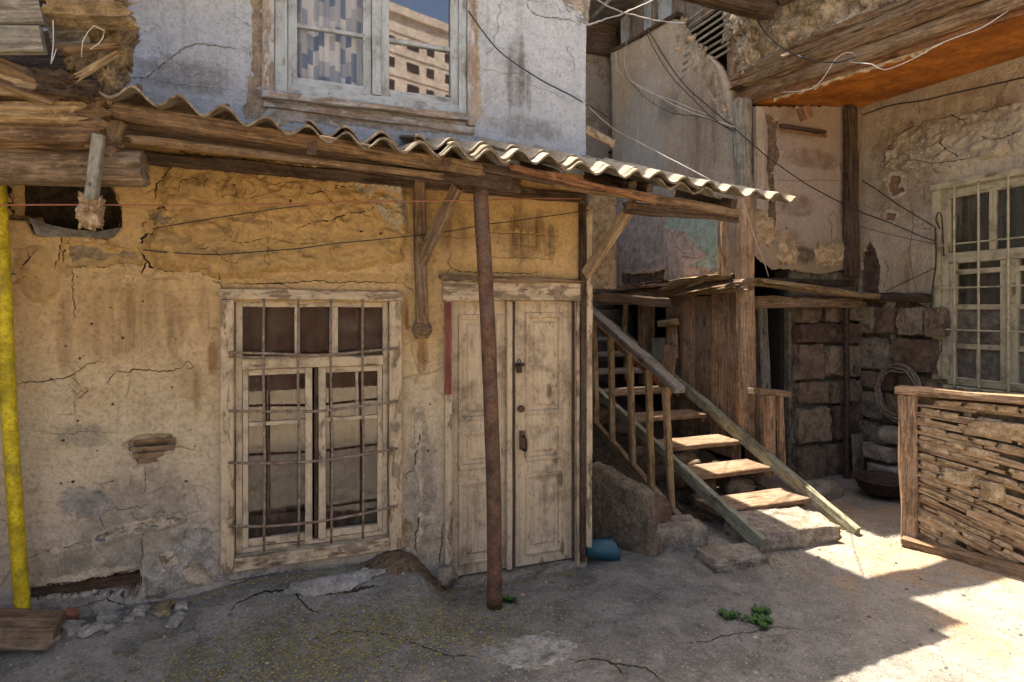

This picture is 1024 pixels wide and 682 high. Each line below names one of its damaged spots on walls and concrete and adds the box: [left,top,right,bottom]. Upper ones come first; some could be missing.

crack [129,35,252,90]
crack [12,151,409,324]
peeling [616,203,718,290]
spalling [814,241,845,270]
crack [16,358,194,398]
peeling [56,480,113,521]
peeling [28,511,216,600]
crack [213,562,480,661]
crack [575,658,662,681]